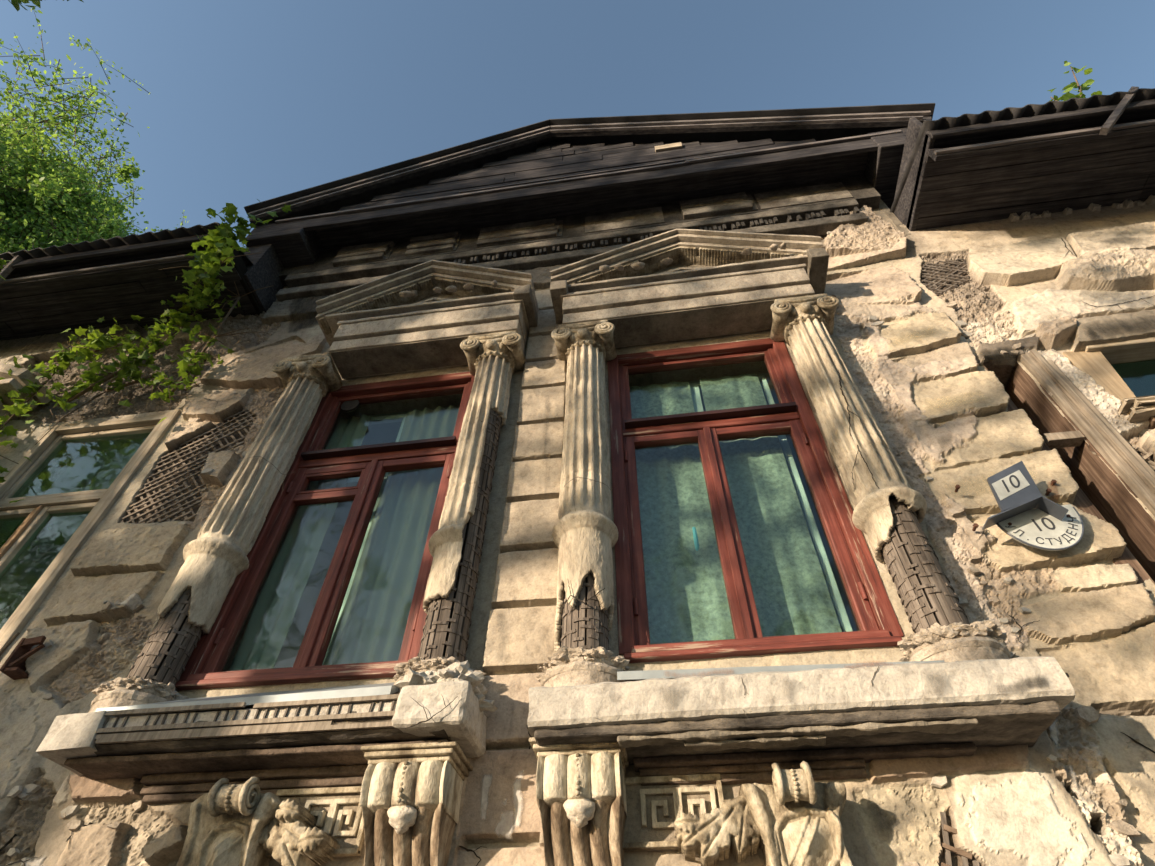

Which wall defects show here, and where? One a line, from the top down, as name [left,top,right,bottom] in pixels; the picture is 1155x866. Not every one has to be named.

spalling [919,248,1153,450]
spalling [178,378,285,533]
crack [838,370,879,488]
spalling [834,303,1063,659]
spalling [0,767,188,866]
crack [1121,732,1155,753]